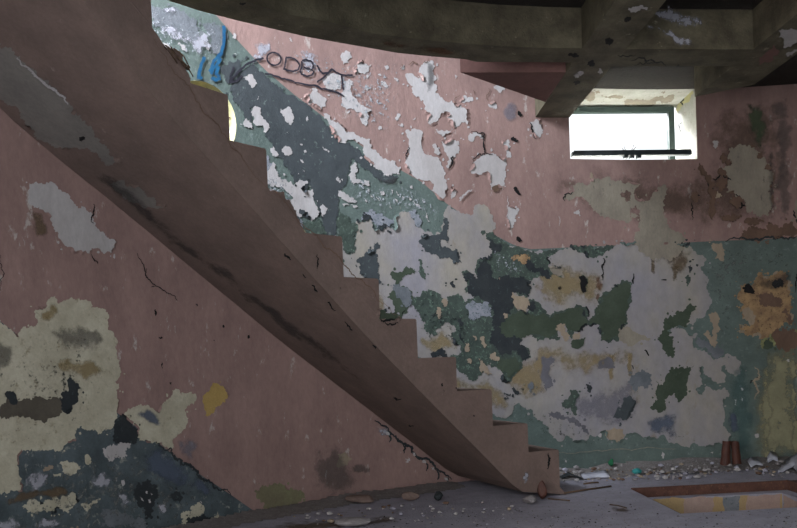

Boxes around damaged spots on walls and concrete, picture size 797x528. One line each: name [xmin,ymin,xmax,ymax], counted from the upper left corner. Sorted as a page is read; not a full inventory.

peeling [245,43,270,88]
peeling [241,96,270,133]
peeling [280,107,294,133]
water stain [726,105,769,166]
peeling [26,181,117,259]
peeling [267,144,327,227]
peeling [301,50,760,453]
flaking render [734,269,797,362]
peeling [0,296,231,497]
water stain [757,349,797,457]
peeling [22,492,148,528]
peeling [181,501,205,524]